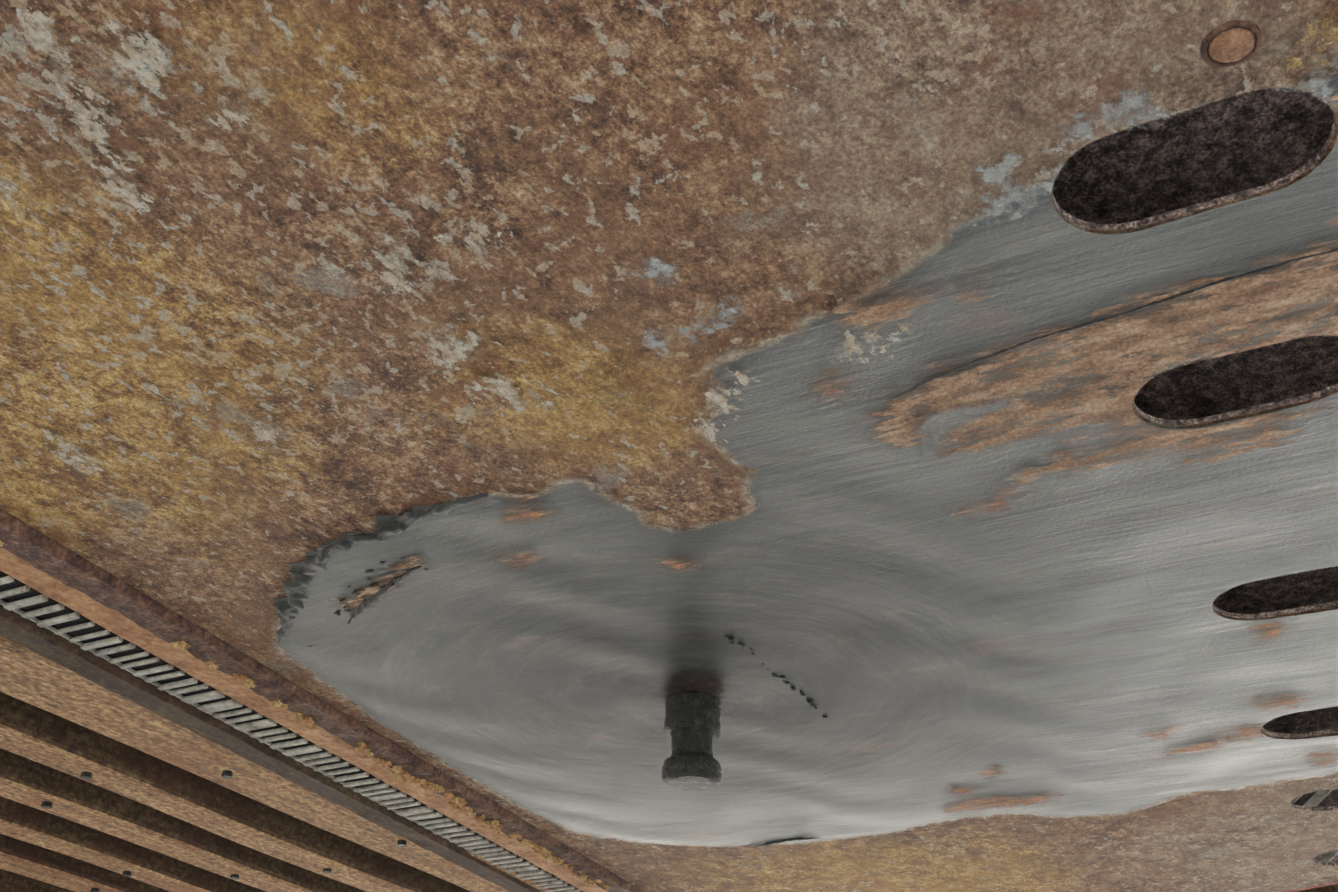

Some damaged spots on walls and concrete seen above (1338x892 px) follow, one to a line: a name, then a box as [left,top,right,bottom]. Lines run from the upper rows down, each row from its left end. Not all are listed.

corrosion [830,259,988,331]
corrosion [862,240,1338,516]
water stain [915,399,1013,454]
corrosion [339,556,425,611]
corrosion [269,700,318,730]
corrosion [1141,694,1306,759]
corrosion [355,742,611,889]
corrosion [938,765,1060,814]